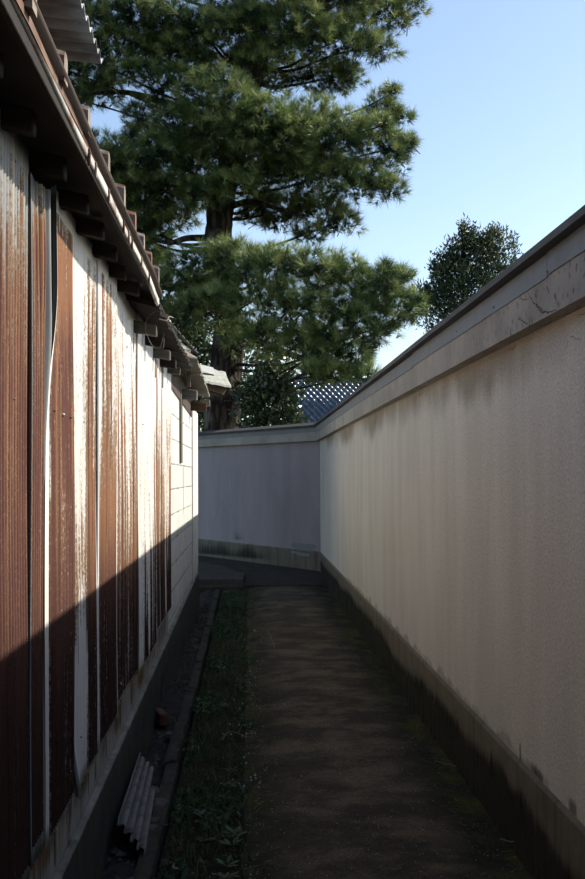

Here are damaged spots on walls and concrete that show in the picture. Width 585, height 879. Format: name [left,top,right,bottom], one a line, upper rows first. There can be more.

rust [0,168,172,879]
crack [517,291,557,326]